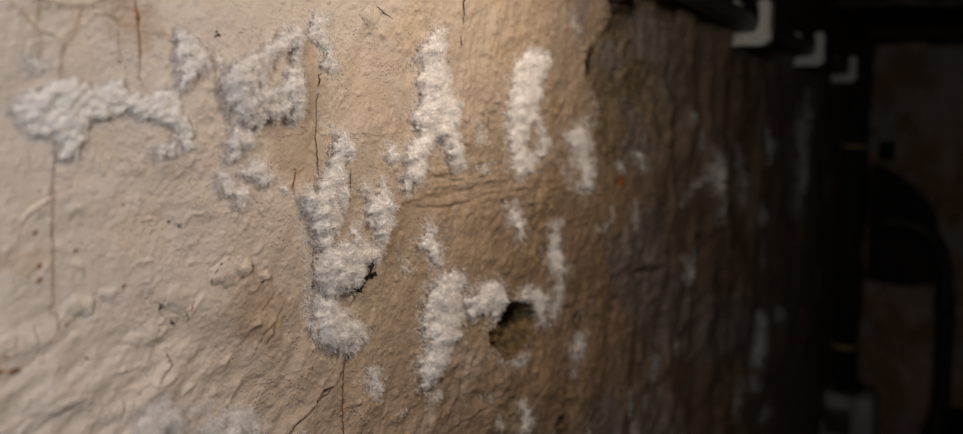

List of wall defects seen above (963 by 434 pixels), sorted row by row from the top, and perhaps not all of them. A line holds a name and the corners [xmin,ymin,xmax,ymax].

leakage [5,1,601,427]
spalling [488,298,536,361]